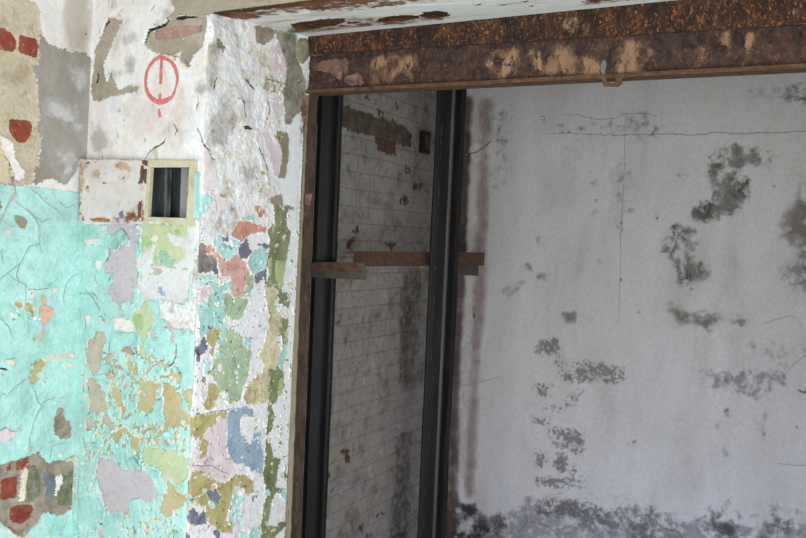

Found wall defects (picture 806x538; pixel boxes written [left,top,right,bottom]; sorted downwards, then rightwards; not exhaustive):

rust [212,0,450,30]
rust [309,54,365,86]
water stain [692,144,760,220]
crack [0,153,80,335]
peeling [0,0,307,538]
crack [543,101,806,324]
water stain [662,226,705,283]
water stain [790,204,806,237]
crack [0,368,53,447]
water stain [446,503,507,538]
water stain [718,524,734,536]